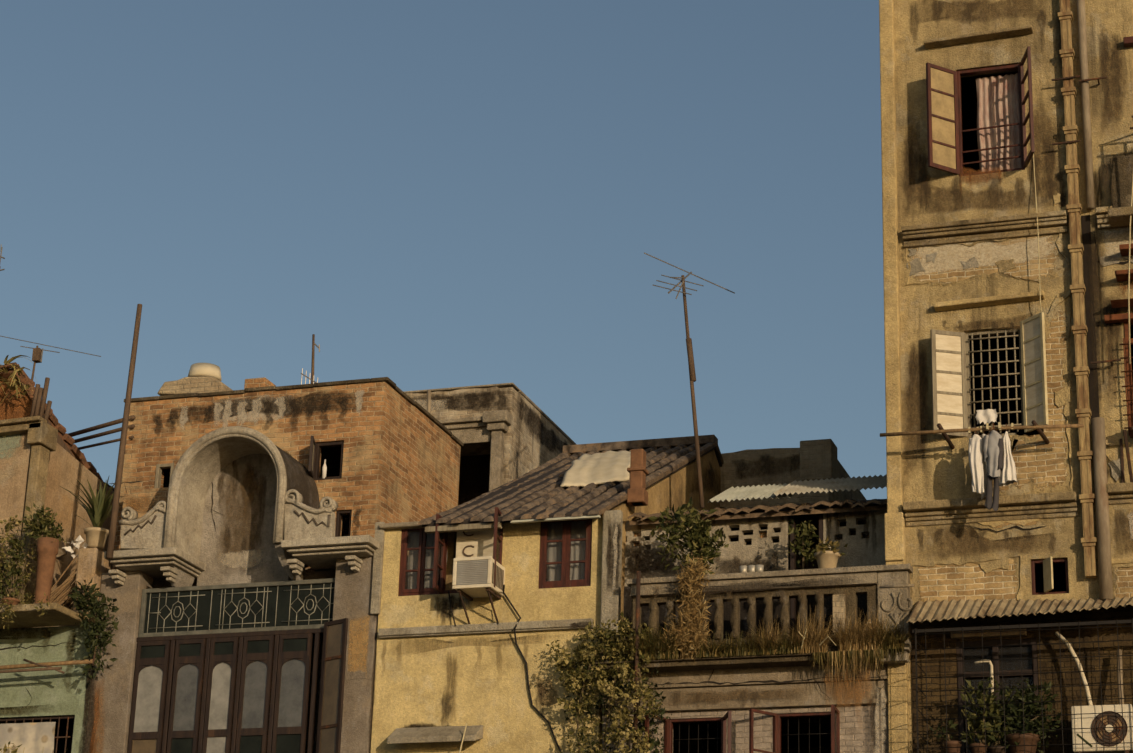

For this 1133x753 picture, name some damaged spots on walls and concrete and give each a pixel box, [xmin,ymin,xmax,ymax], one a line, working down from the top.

water stain [911,0,1061,50]
water stain [905,109,1065,211]
flaking render [900,233,1071,287]
water stain [154,391,364,431]
flaking render [992,290,1077,496]
water stain [435,596,469,619]
flaking render [907,553,1027,611]